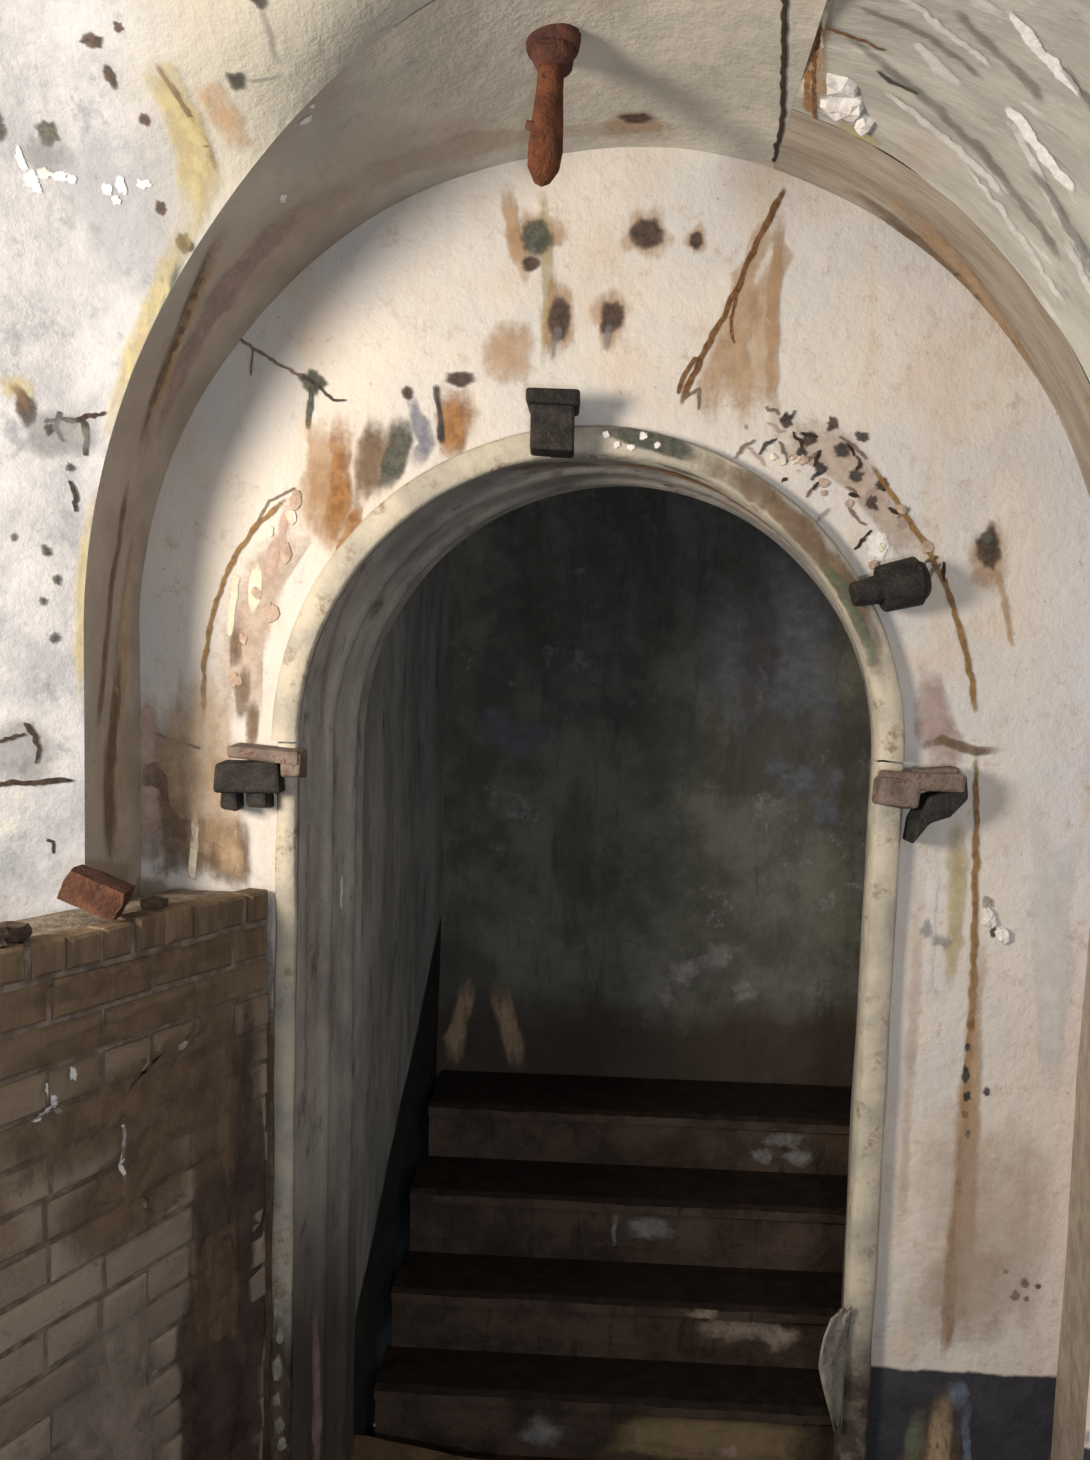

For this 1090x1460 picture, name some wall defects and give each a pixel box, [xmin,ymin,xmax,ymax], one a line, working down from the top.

crack [240,338,303,377]
rust [687,229,703,250]
rust [704,237,790,397]
crack [677,0,885,409]
rust [299,370,473,550]
flaking render [734,406,946,581]
rust [942,761,990,1340]
water stain [70,989,274,1460]